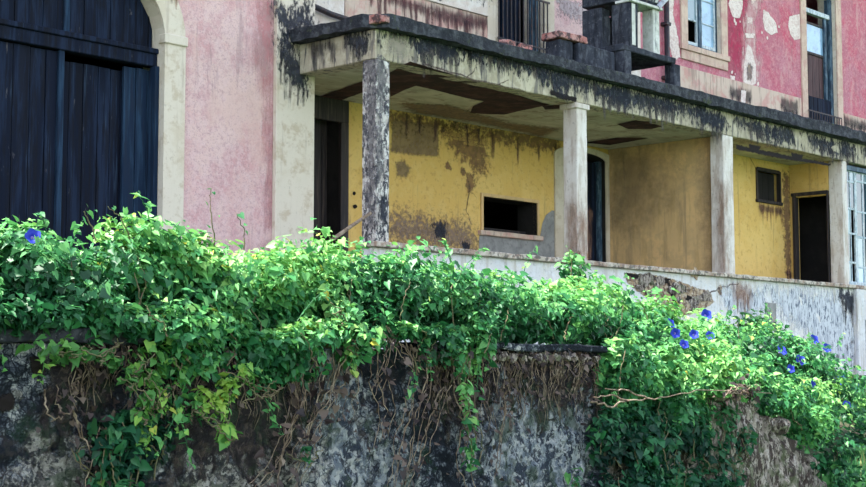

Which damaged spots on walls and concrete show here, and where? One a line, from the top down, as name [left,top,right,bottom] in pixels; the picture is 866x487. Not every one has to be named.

water stain [270,0,320,105]
water stain [311,39,335,66]
water stain [371,0,492,35]
peeling [375,55,490,224]
spalling [542,90,577,110]
water stain [344,30,866,250]
water stain [727,0,751,103]
peeling [729,0,800,86]
peeling [624,267,855,372]
water stain [838,288,854,325]